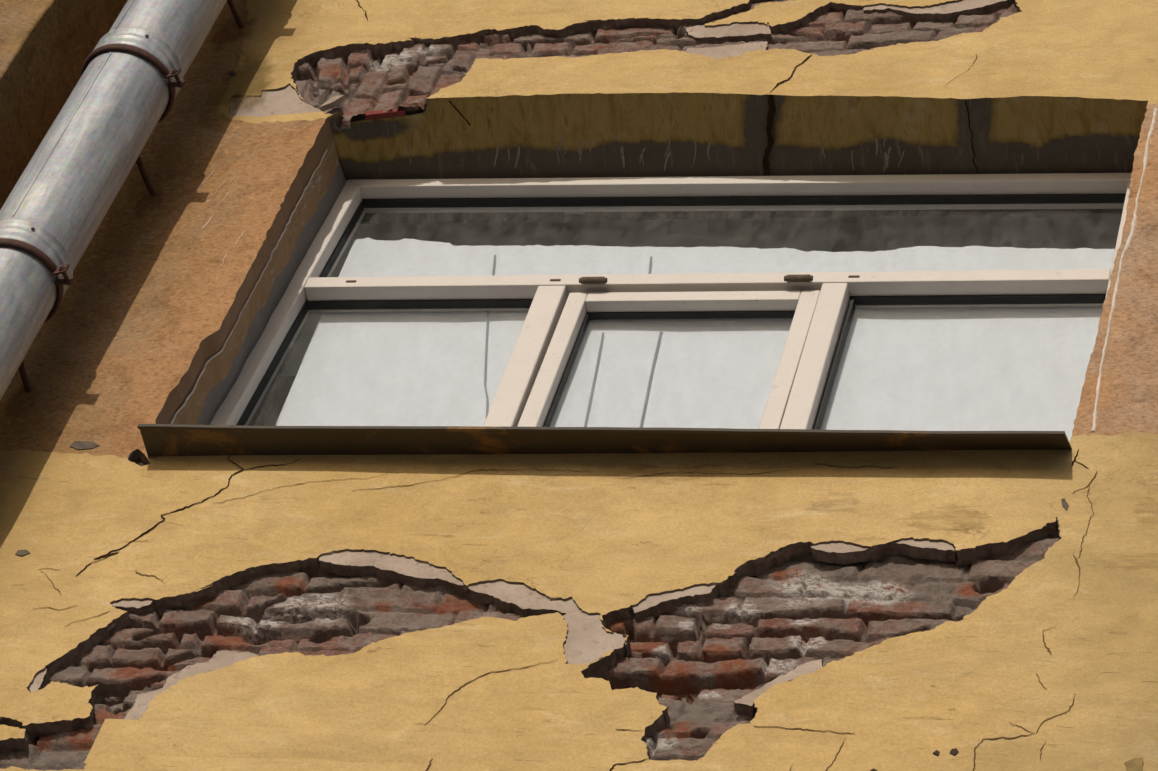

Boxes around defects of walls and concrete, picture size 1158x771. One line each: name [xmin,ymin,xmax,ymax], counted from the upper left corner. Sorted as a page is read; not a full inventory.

flaking render [229,0,1017,131]
peeling [70,441,100,450]
crack [36,455,588,626]
crack [621,459,891,479]
crack [1071,448,1097,597]
crack [425,661,551,771]
flaking render [0,537,1059,771]
crack [753,725,855,771]
crack [972,626,1075,771]
peeling [1124,757,1143,771]